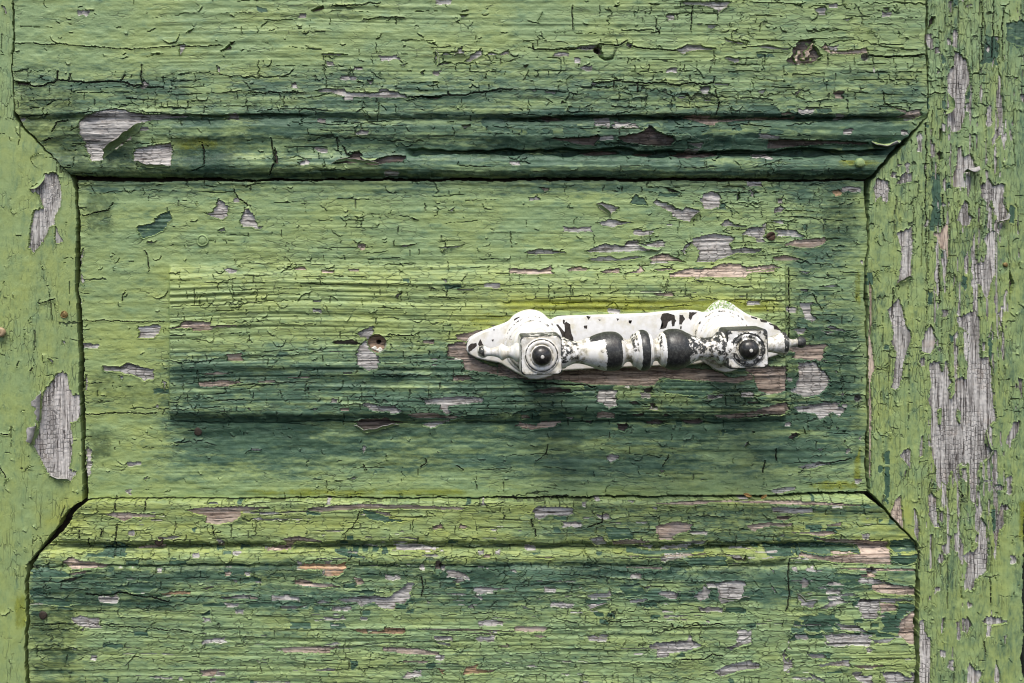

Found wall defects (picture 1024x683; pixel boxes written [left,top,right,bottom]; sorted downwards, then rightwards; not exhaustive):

crack [18,43,221,88]
crack [412,89,512,98]
crack [533,4,693,51]
crack [591,77,719,115]
crack [870,52,924,60]
peeling [79,109,188,168]
peeling [933,52,1011,298]
peeling [568,203,827,282]
peeling [447,289,845,431]
peeling [26,359,93,482]
crack [497,495,568,536]
peeling [649,299,1009,683]